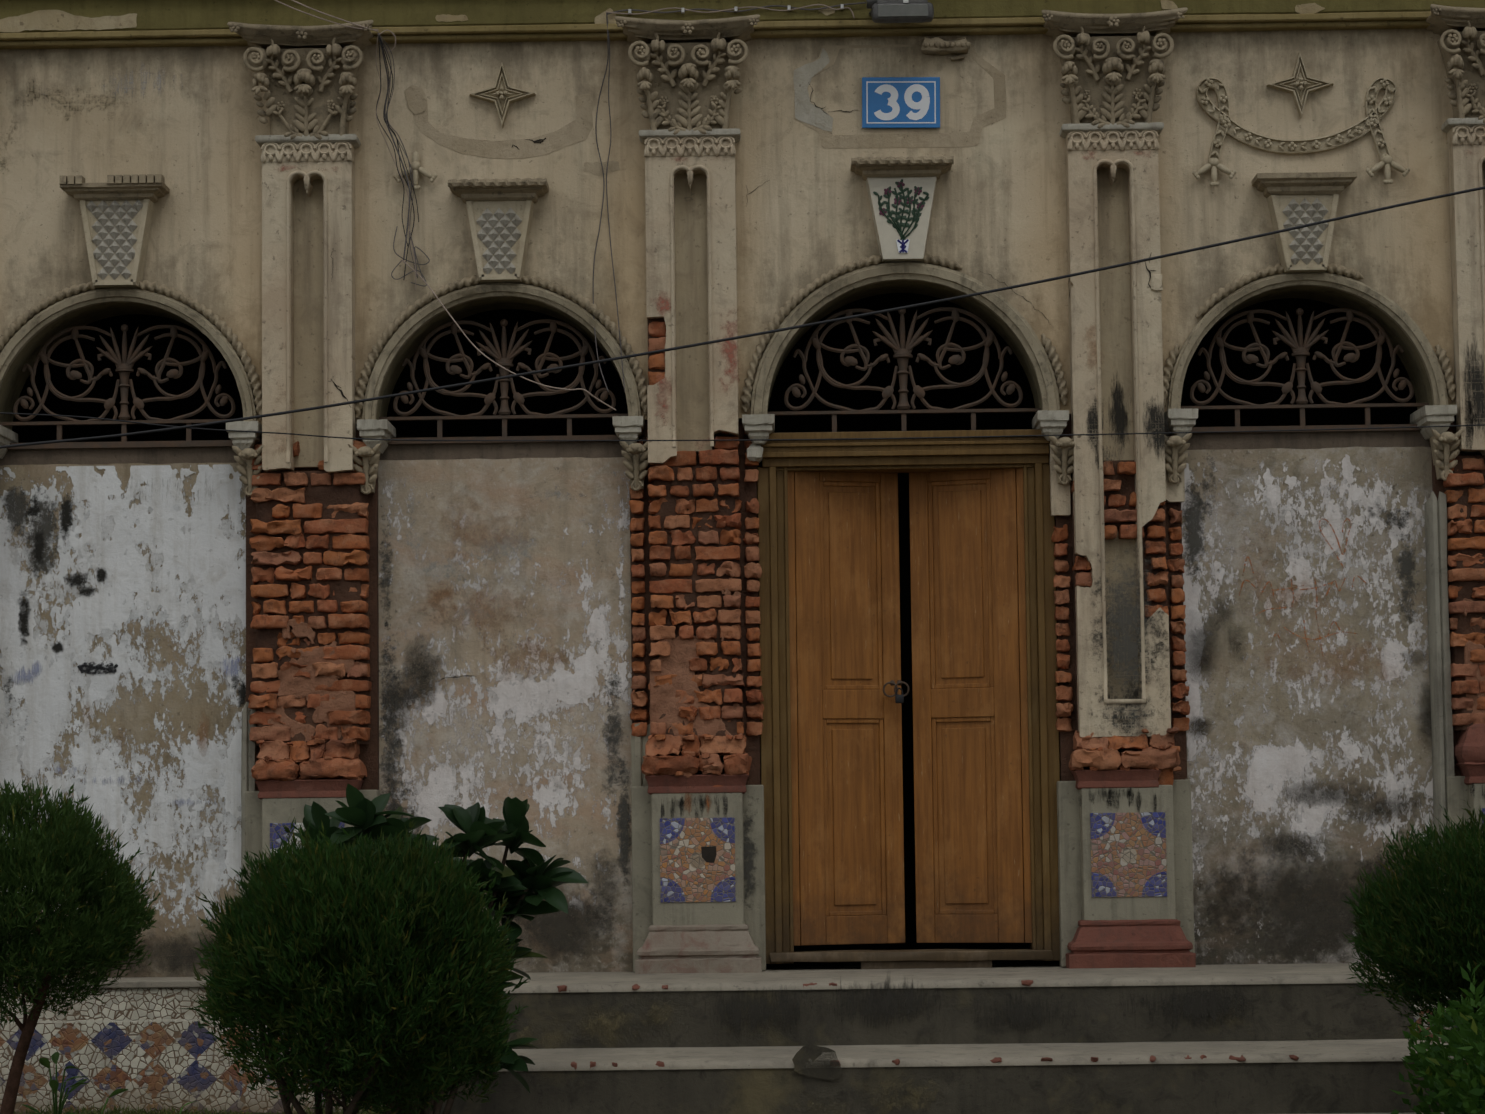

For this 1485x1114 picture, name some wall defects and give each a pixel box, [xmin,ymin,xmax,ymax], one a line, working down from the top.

damp [18,598,30,643]
damp [4,488,107,596]
peeling [0,422,764,938]
damp [380,648,437,834]
peeling [1049,438,1485,889]